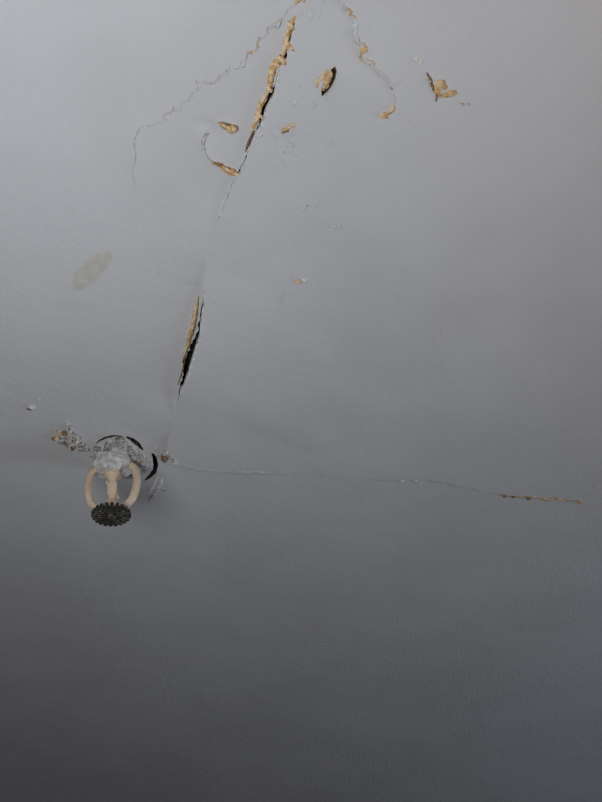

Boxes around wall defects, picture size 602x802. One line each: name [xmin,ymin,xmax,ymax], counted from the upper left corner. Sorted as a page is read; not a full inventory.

spalling [315,66,383,121]
flaking render [426,71,471,107]
peeling [182,121,240,195]
crack [97,0,325,481]
flaking render [52,423,91,452]
crack [368,478,602,504]